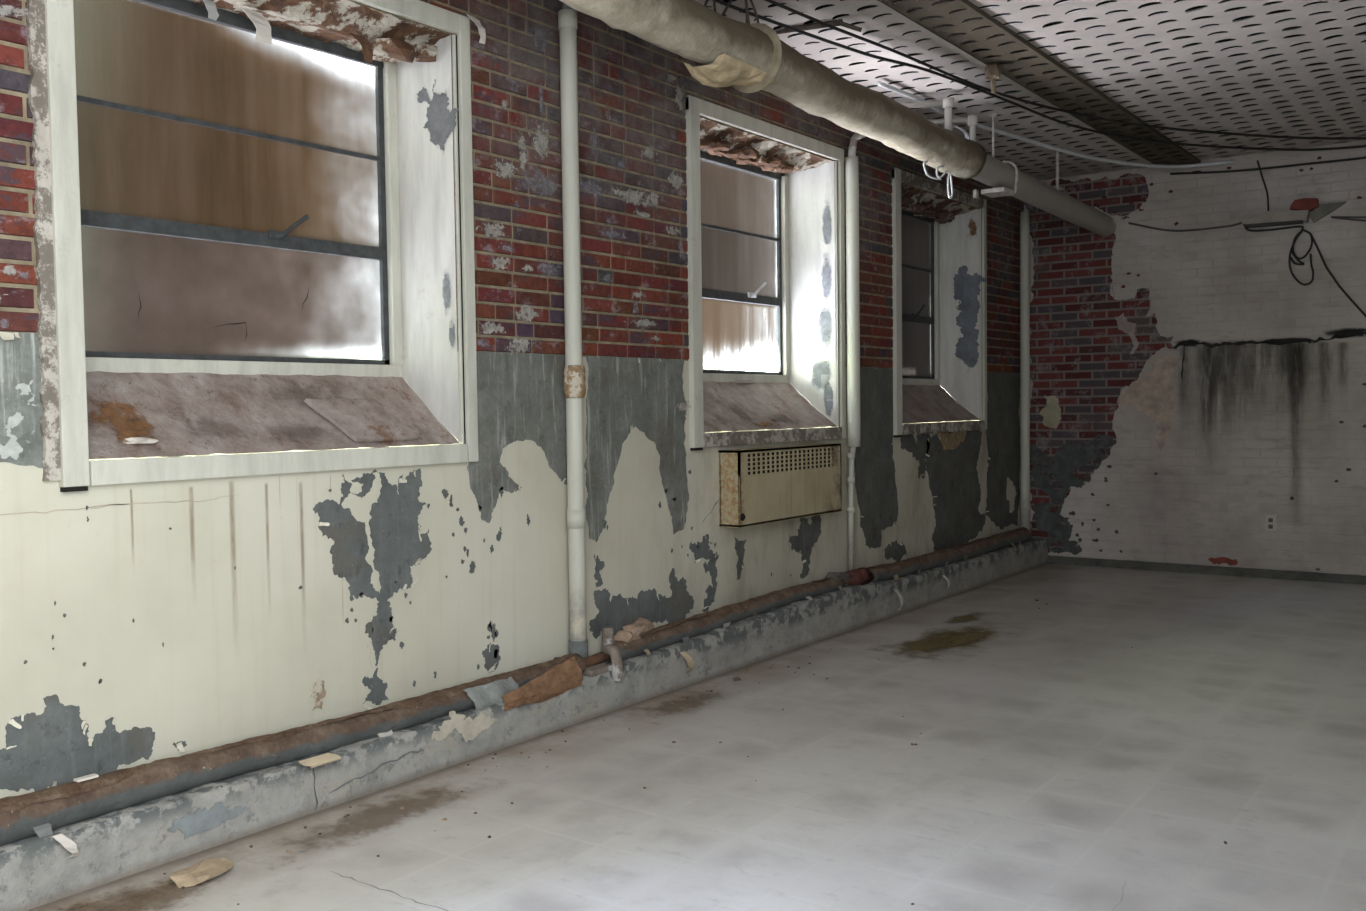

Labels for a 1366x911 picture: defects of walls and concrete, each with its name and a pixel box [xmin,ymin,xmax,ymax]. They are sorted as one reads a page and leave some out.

flaking render [350,33,438,64]
peeling [417,79,458,153]
peeling [0,332,44,468]
peeling [854,173,1173,562]
damp [1179,339,1217,387]
damp [1262,328,1366,369]
peeling [313,351,567,709]
peeling [584,356,719,639]
damp [906,627,991,652]
rust [311,678,326,710]
peeling [0,694,155,792]
crack [331,871,448,911]